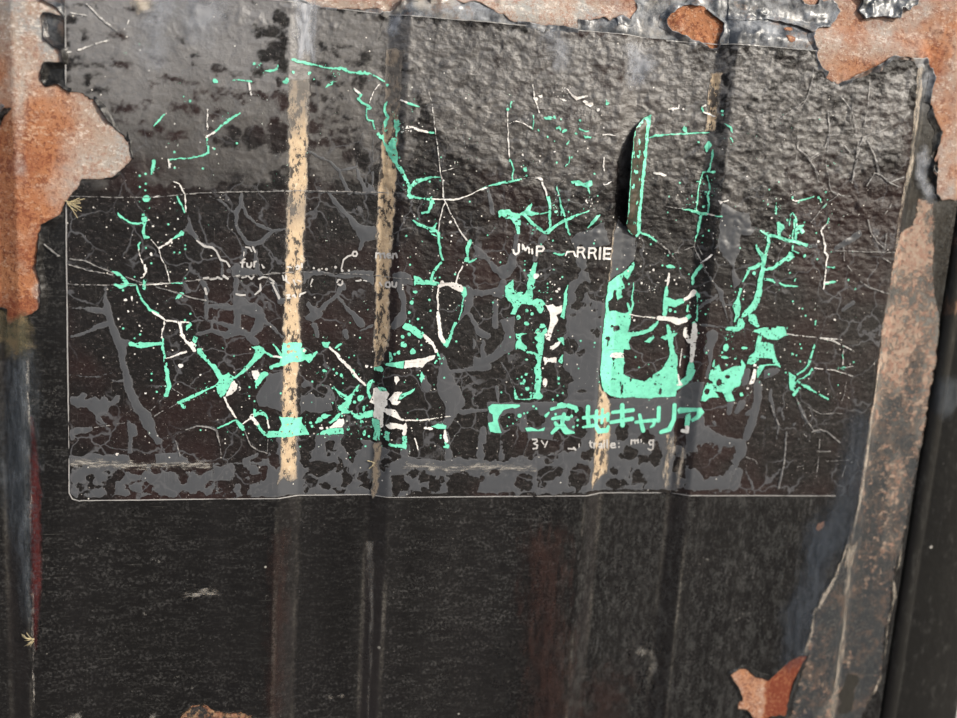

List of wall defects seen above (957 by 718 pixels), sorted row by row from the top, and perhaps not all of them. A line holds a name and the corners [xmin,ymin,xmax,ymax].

corrosion [292,0,642,33]
corrosion [658,0,730,50]
peeling [727,0,841,32]
peeling [858,0,919,19]
corrosion [0,0,134,357]
crack [429,93,469,242]
peeling [626,115,651,237]
crack [786,72,904,294]
crack [44,239,313,301]
crack [771,333,853,489]
corrosion [727,0,957,718]
peeling [837,674,859,714]